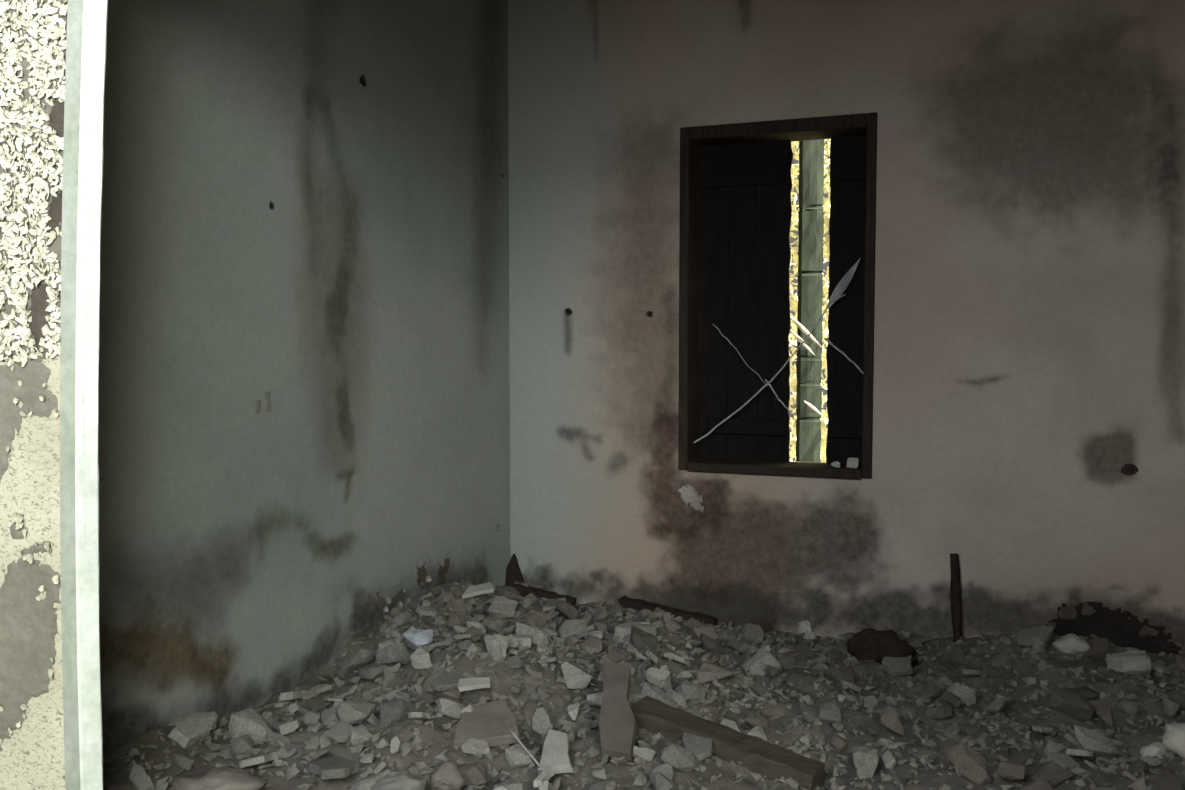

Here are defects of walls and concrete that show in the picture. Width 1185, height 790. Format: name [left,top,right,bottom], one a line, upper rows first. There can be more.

peeling [0,0,68,483]
water stain [420,561,488,591]
peeling [0,512,61,751]
water stain [208,631,338,719]
water stain [102,711,166,755]